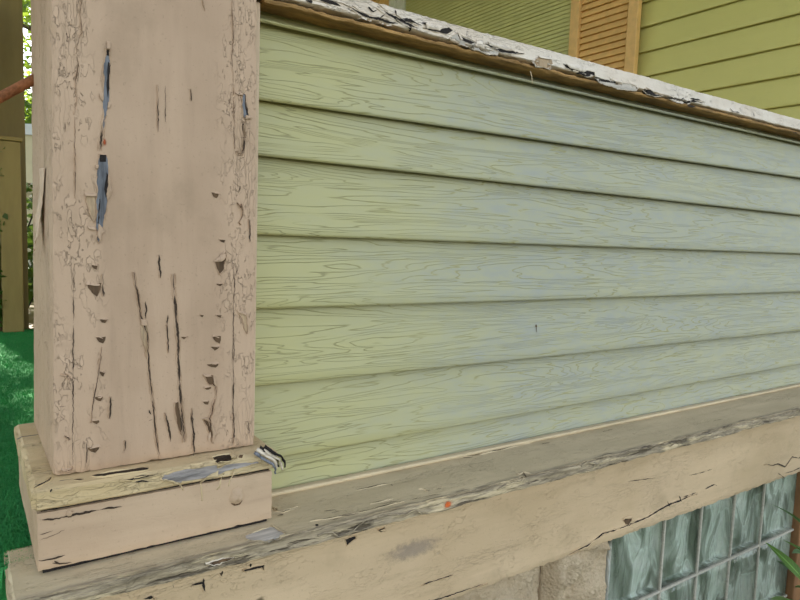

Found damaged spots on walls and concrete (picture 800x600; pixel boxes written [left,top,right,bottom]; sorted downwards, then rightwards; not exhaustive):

peeling [423,23,525,55]
peeling [99,41,111,135]
peeling [530,55,663,97]
peeling [33,168,45,254]
peeling [85,153,113,244]
crack [237,189,251,241]
peeling [86,264,101,296]
peeling [213,239,226,286]
crack [119,253,250,482]
peeling [253,445,286,474]
crack [764,456,800,478]
crack [569,469,717,555]